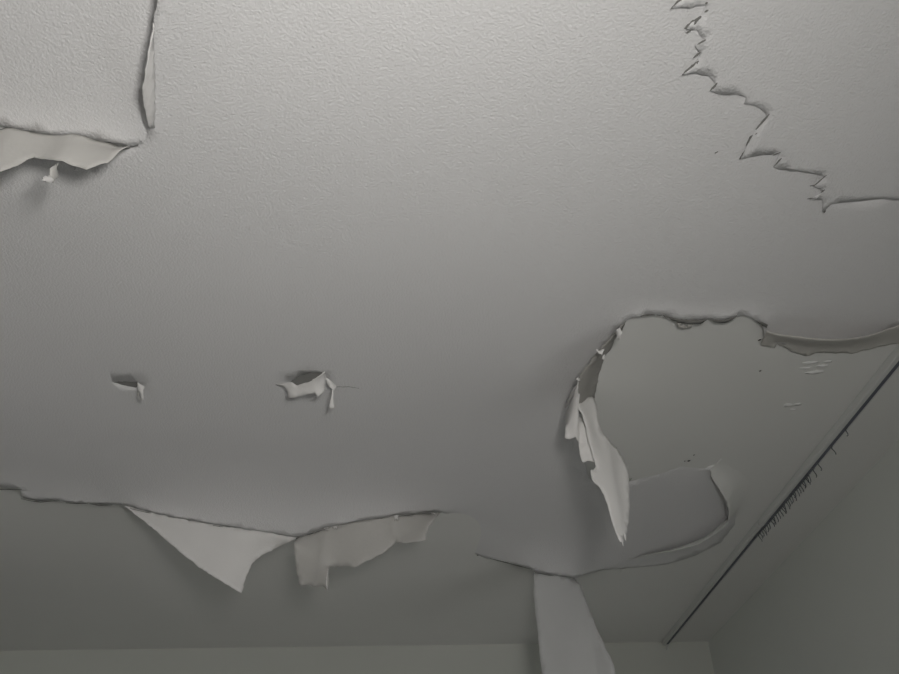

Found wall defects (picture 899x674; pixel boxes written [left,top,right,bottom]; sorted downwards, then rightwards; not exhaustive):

peeling [142,22,156,128]
crack [682,2,709,75]
peeling [0,127,131,172]
crack [740,114,770,159]
peeling [761,325,899,356]
crack [0,489,149,513]
peeling [565,381,630,547]
peeling [125,506,297,593]
peeling [294,512,440,590]
peeling [533,573,615,674]